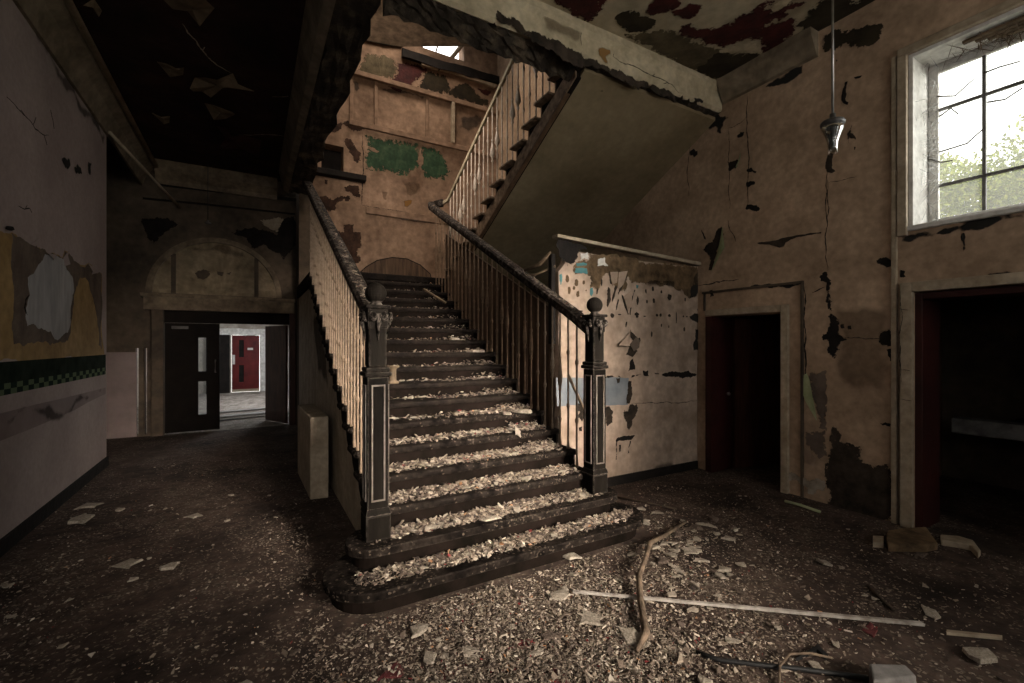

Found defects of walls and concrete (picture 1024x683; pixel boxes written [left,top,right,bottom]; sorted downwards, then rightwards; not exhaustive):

peeling [554,0,607,23]
spalling [496,10,676,99]
peeling [645,0,805,54]
spalling [822,23,883,62]
peeling [841,75,862,105]
peeling [332,121,450,180]
peeling [825,153,835,173]
spalling [234,216,296,260]
peeling [0,231,104,361]
crack [804,176,854,374]
spalling [556,228,724,460]
spalling [805,370,891,520]